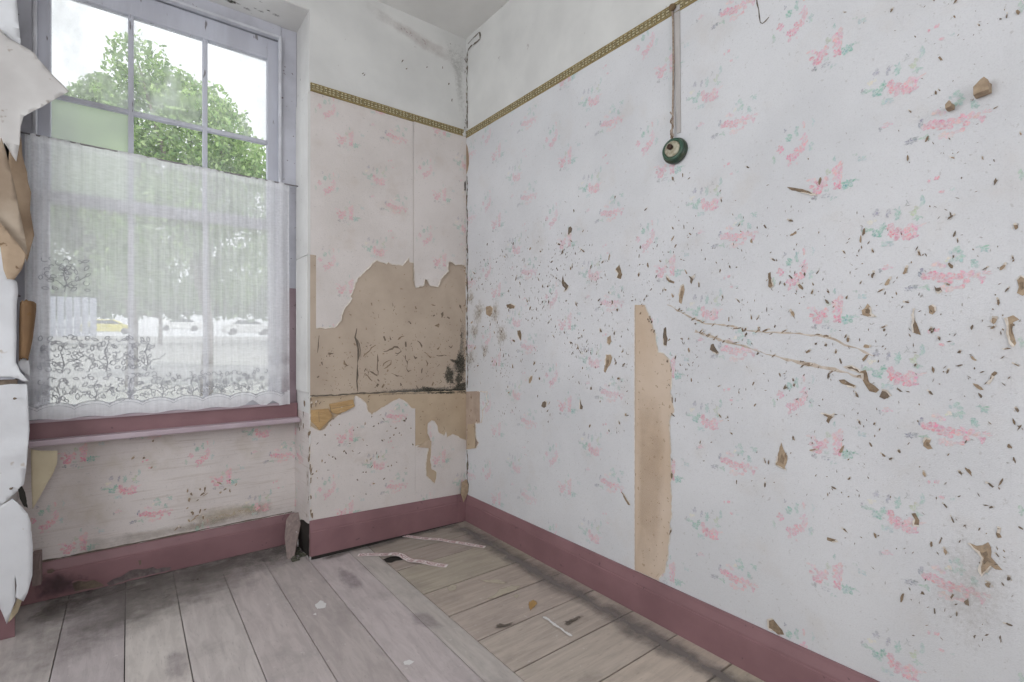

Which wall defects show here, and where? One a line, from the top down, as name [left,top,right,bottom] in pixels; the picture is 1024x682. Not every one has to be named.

mould [419,333,466,394]
flaking render [298,215,737,581]
spalling [766,266,848,328]
spalling [738,305,910,479]
spalling [842,212,1010,398]
peeling [970,283,1020,366]
spalling [900,579,969,618]
peeling [959,540,1013,597]